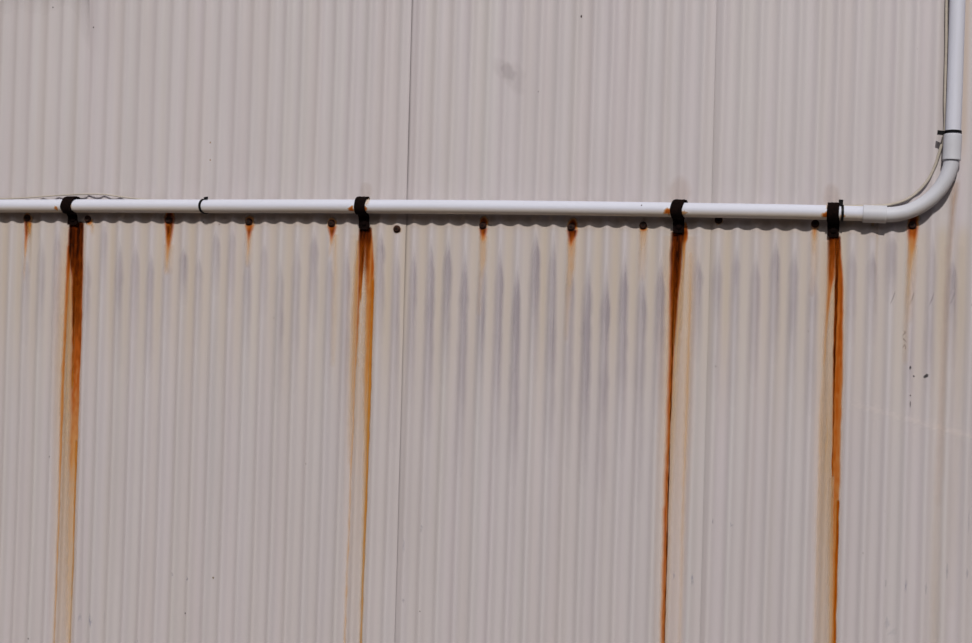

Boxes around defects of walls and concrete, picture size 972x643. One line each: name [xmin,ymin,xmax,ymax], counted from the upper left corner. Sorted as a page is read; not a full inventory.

rust [24,213,33,254]
rust [57,219,93,583]
rust [164,213,175,263]
rust [351,227,374,643]
rust [479,216,489,263]
rust [661,211,690,643]
rust [824,236,843,643]
rust [908,215,920,275]